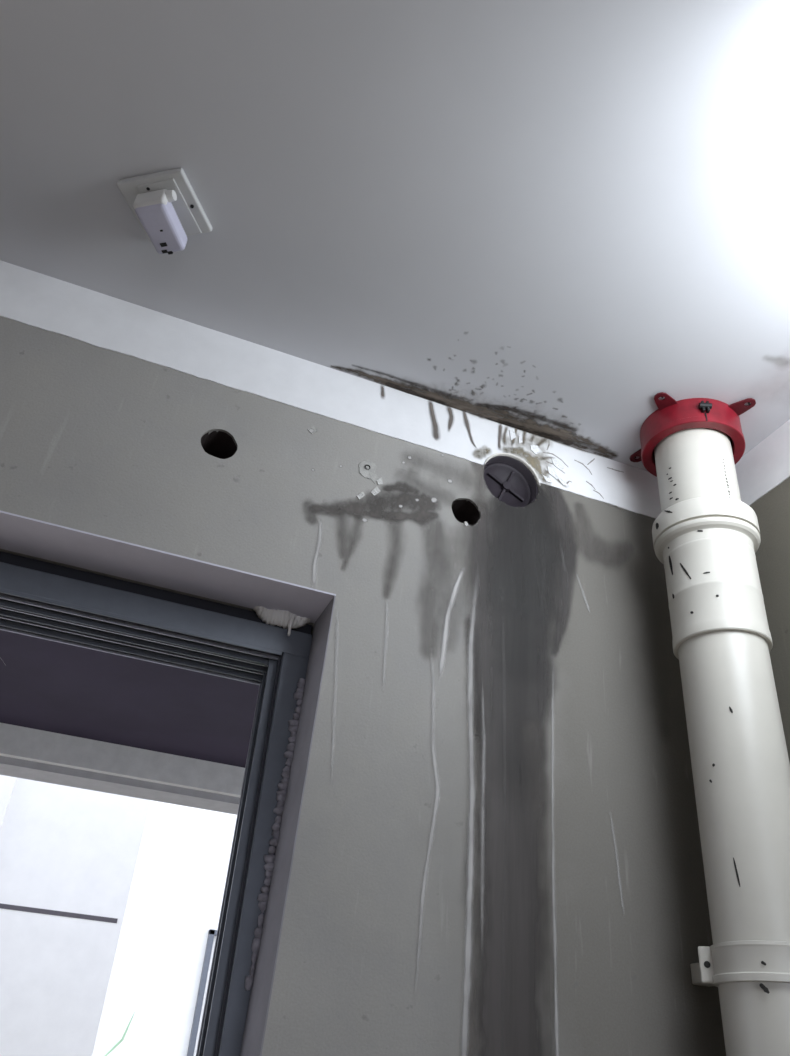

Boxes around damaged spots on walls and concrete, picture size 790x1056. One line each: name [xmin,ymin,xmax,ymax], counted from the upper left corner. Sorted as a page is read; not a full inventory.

damp [331,366,617,459]
damp [308,482,438,679]
damp [417,462,629,1056]